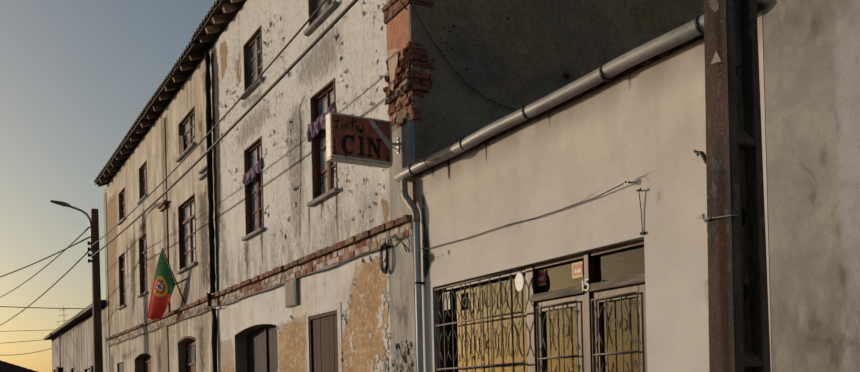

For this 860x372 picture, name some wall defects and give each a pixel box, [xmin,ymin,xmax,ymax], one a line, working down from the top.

peeling [220,38,241,119]
spalling [361,0,458,132]
leakage [422,195,434,277]
peeling [220,342,234,372]
peeling [277,315,307,372]
peeling [339,255,415,372]